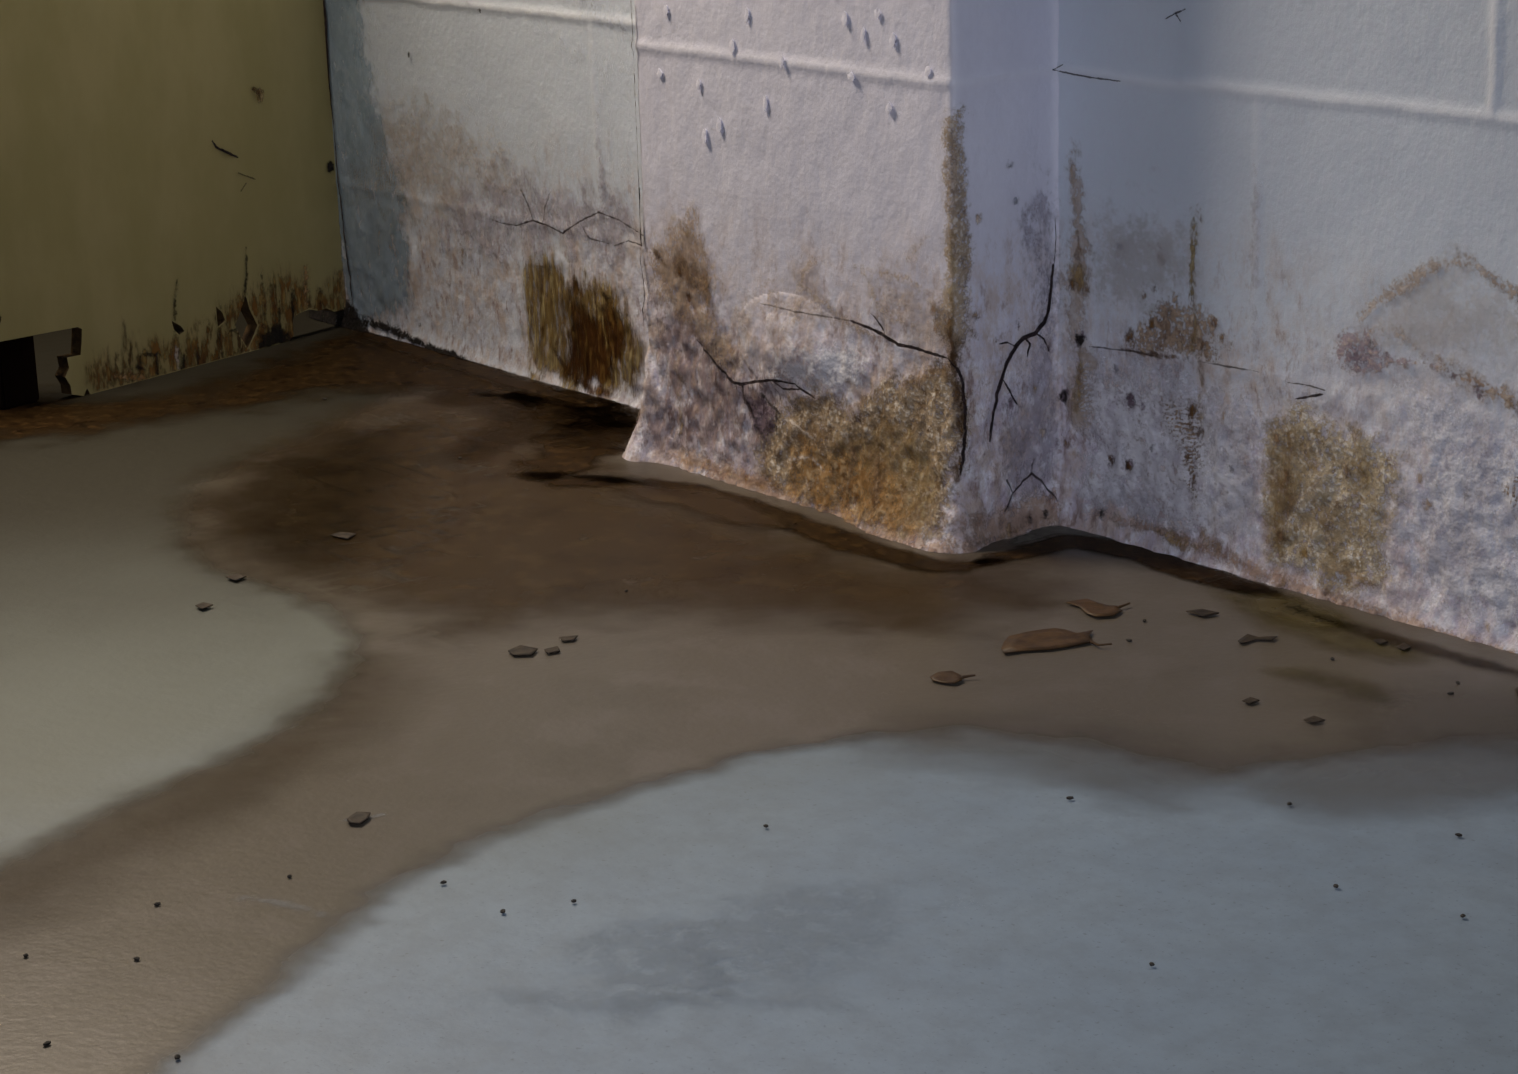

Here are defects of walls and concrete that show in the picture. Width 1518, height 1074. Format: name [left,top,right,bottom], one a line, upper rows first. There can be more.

leakage [308,0,604,413]
crack [487,7,645,326]
crack [696,339,815,413]
crack [760,222,1056,475]
leakage [0,256,1518,1074]